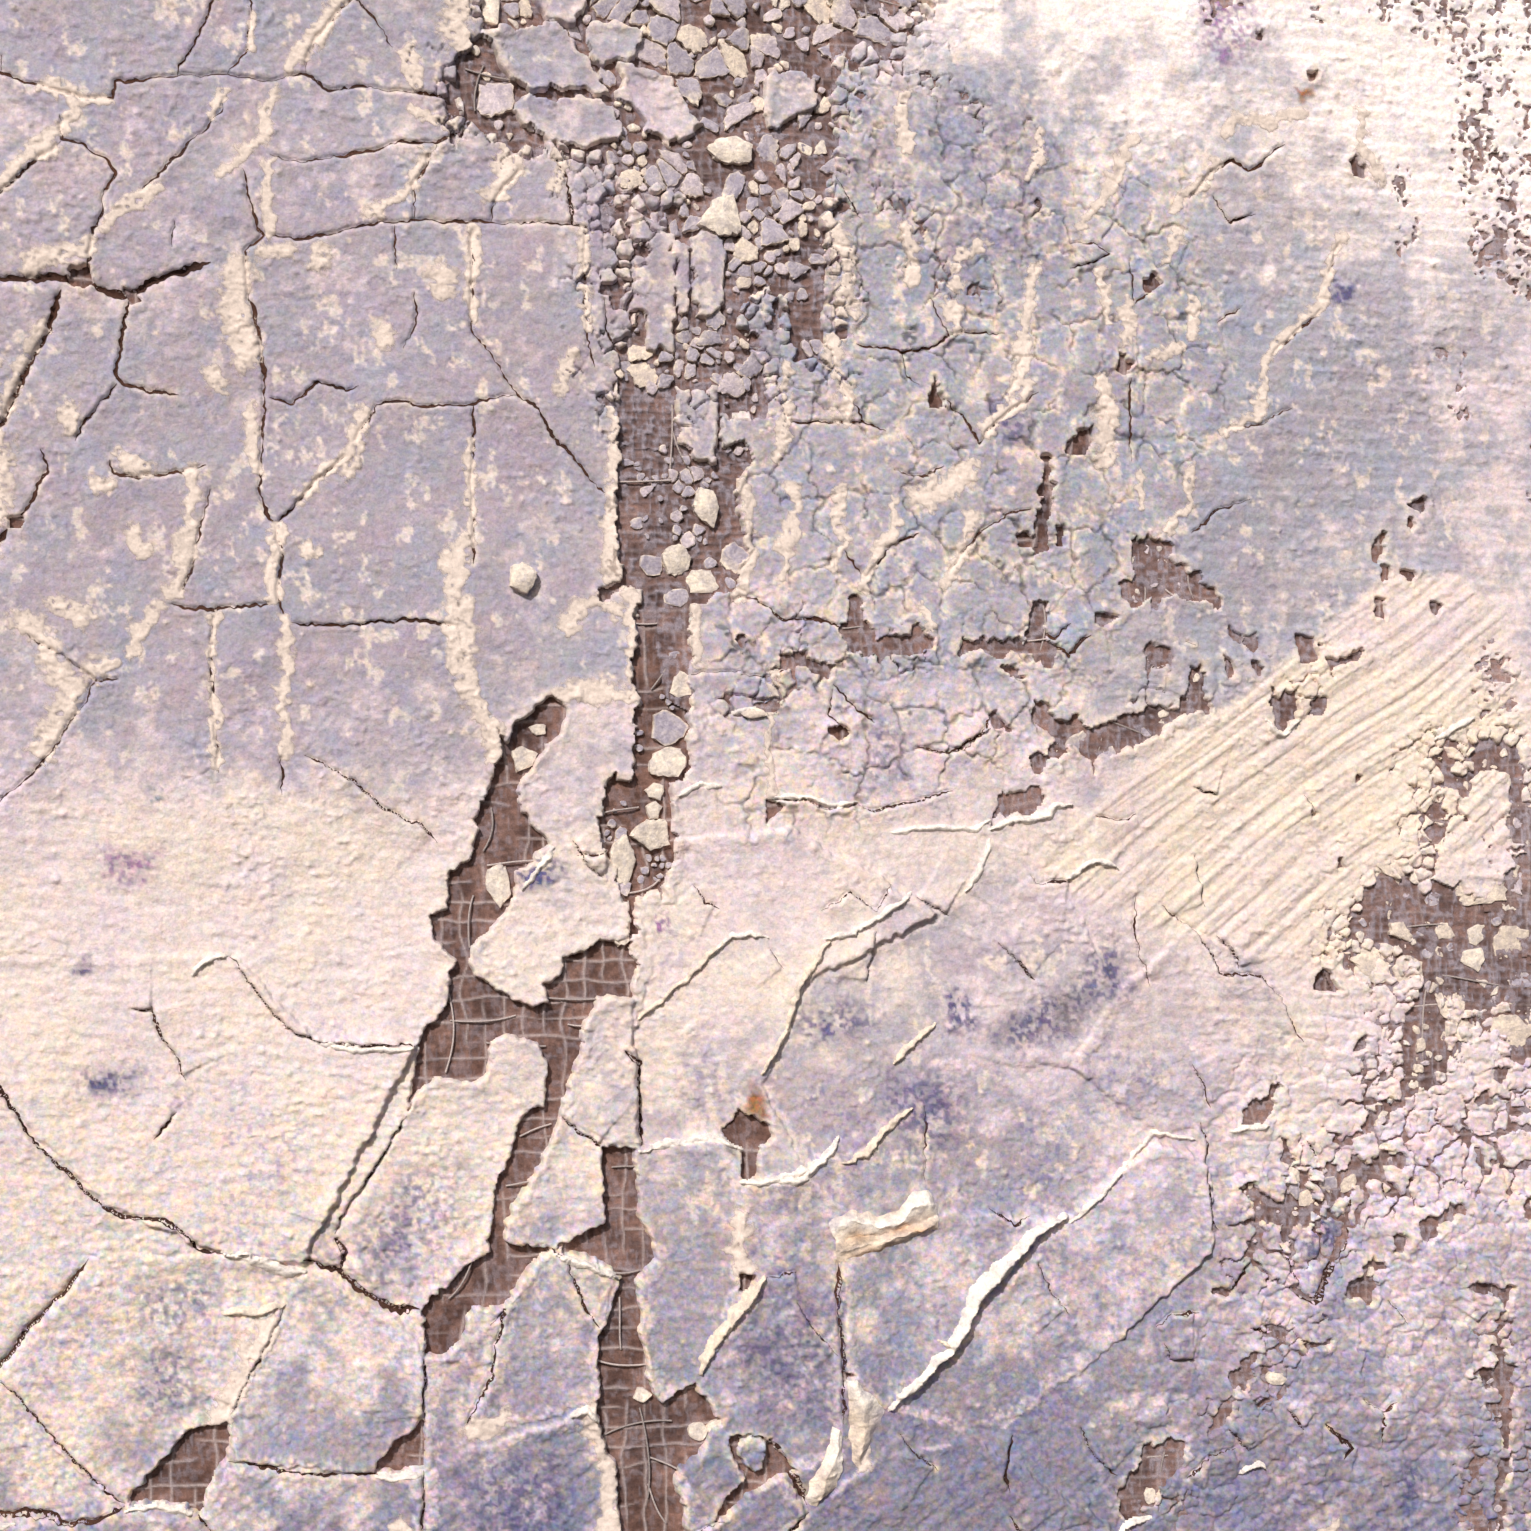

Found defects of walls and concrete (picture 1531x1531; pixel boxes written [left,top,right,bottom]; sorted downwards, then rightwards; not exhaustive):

spalling [1368,0,1531,301]
crack [0,0,605,694]
crack [858,299,1038,445]
peeling [1095,535,1221,627]
spalling [409,0,988,1531]
peeling [988,642,1210,826]
peeling [1220,635,1531,1306]
crack [0,1085,222,1254]
crack [303,1116,419,1316]
crack [0,1260,124,1527]
spalling [130,1421,230,1511]
crack [228,1461,378,1477]